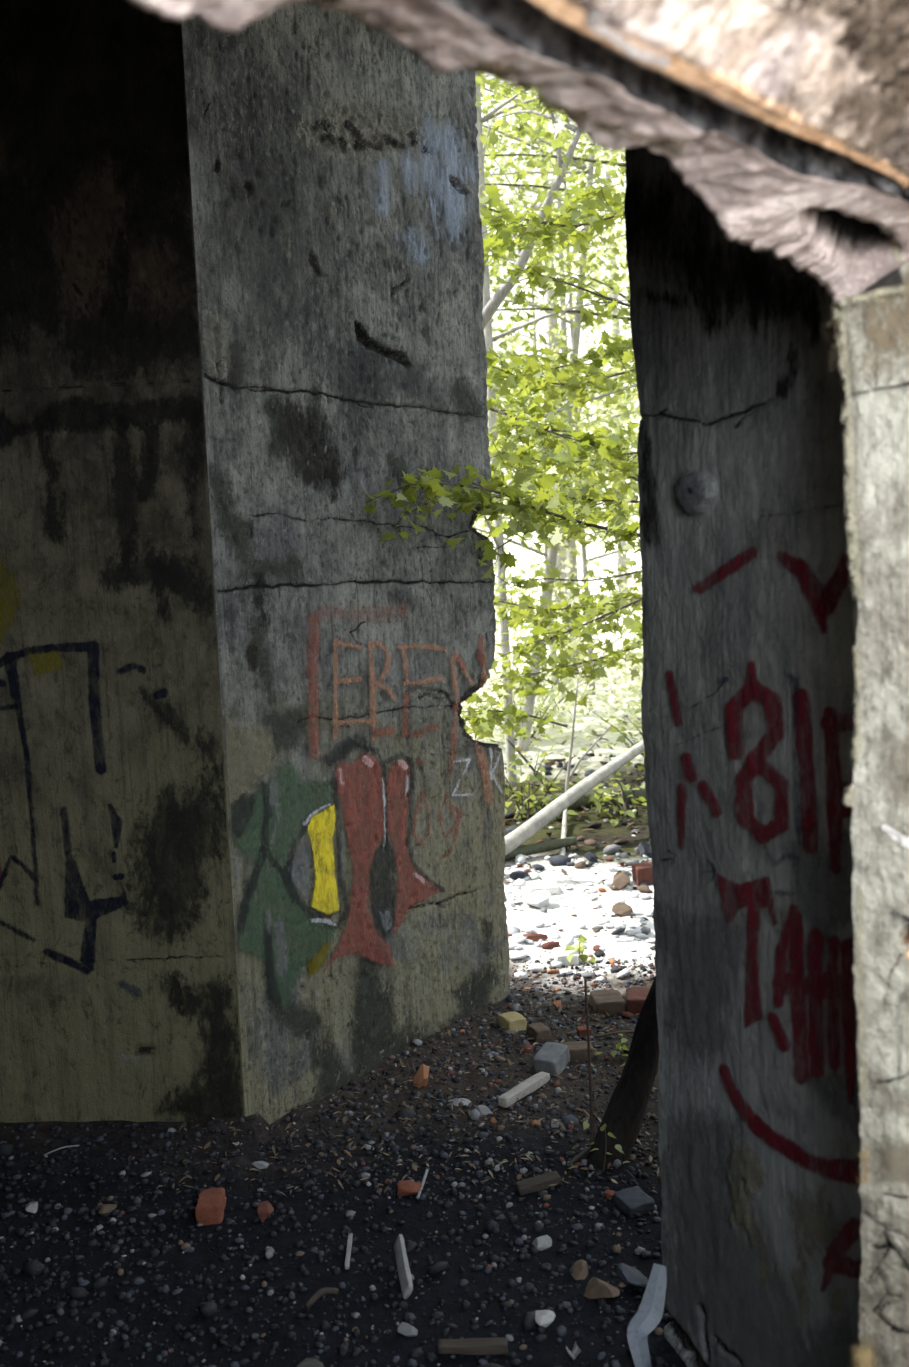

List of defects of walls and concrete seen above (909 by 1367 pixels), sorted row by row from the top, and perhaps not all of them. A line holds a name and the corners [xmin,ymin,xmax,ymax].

spalling [785,0,909,98]
spalling [811,207,903,263]
crack [171,362,483,417]
crack [217,508,491,592]
spalling [408,668,503,750]
crack [865,1193,909,1334]